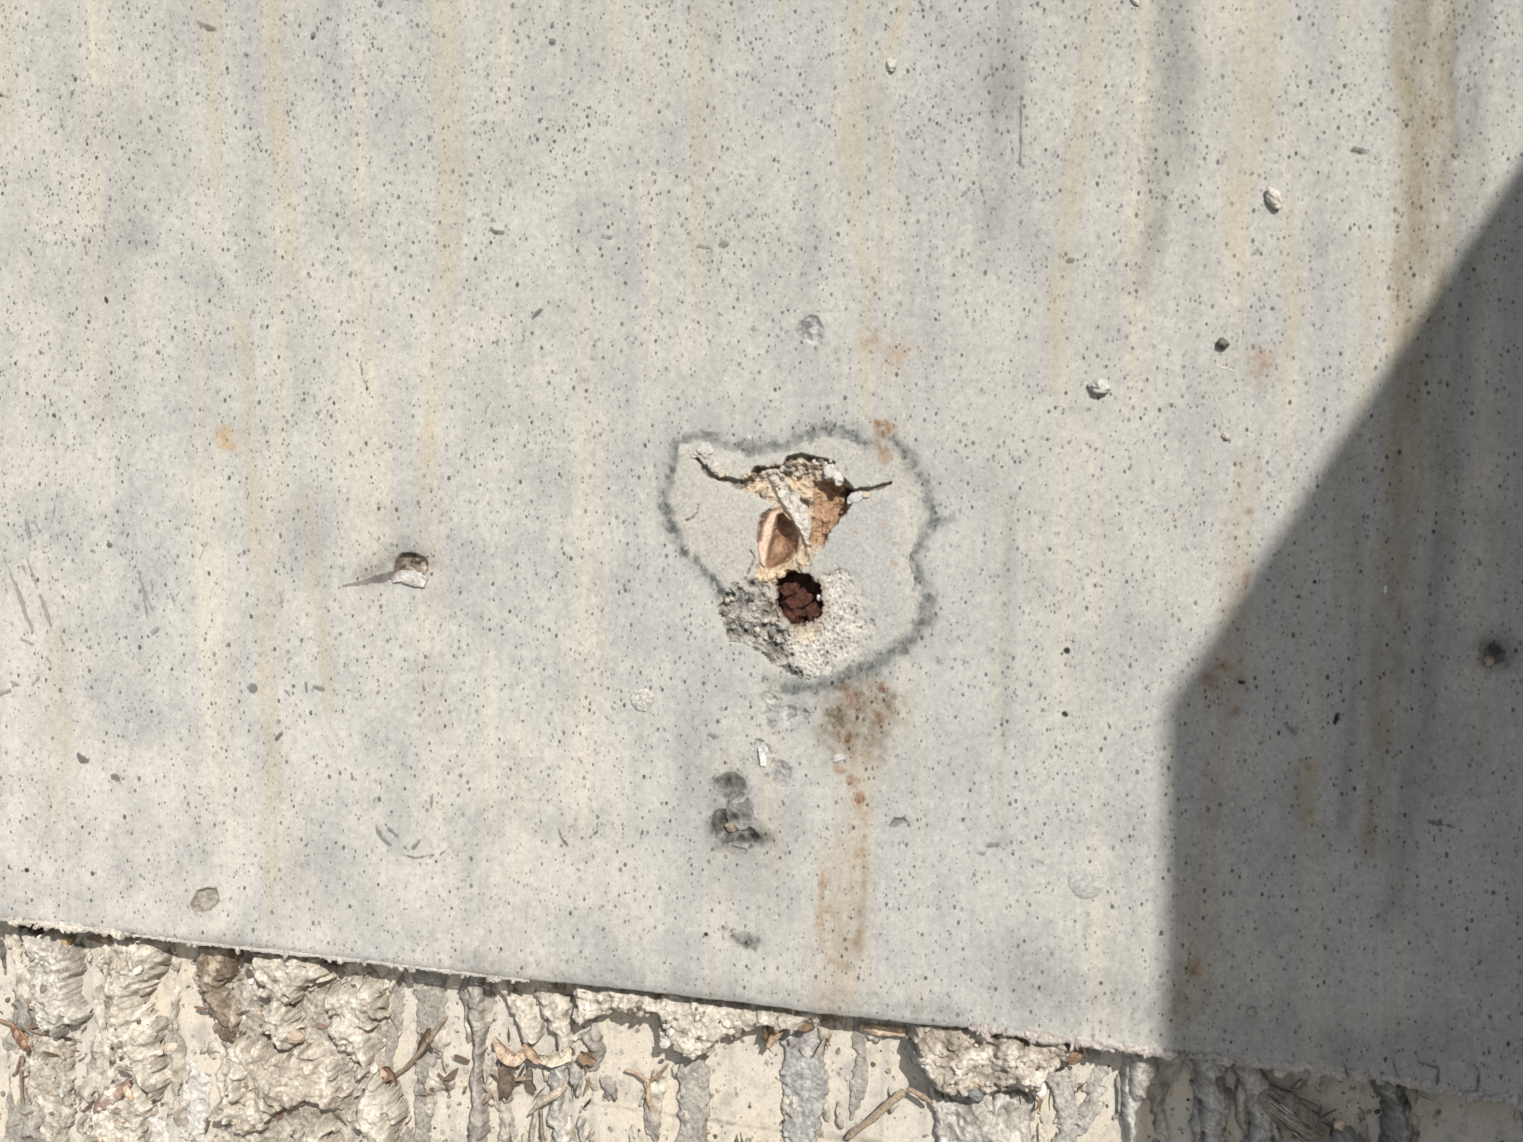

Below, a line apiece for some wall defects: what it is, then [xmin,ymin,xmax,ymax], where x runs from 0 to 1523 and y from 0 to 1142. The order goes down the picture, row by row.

spalling [663,430,928,865]
peeling [188,883,224,918]
spalling [0,916,529,984]
spalling [968,1022,1484,1104]